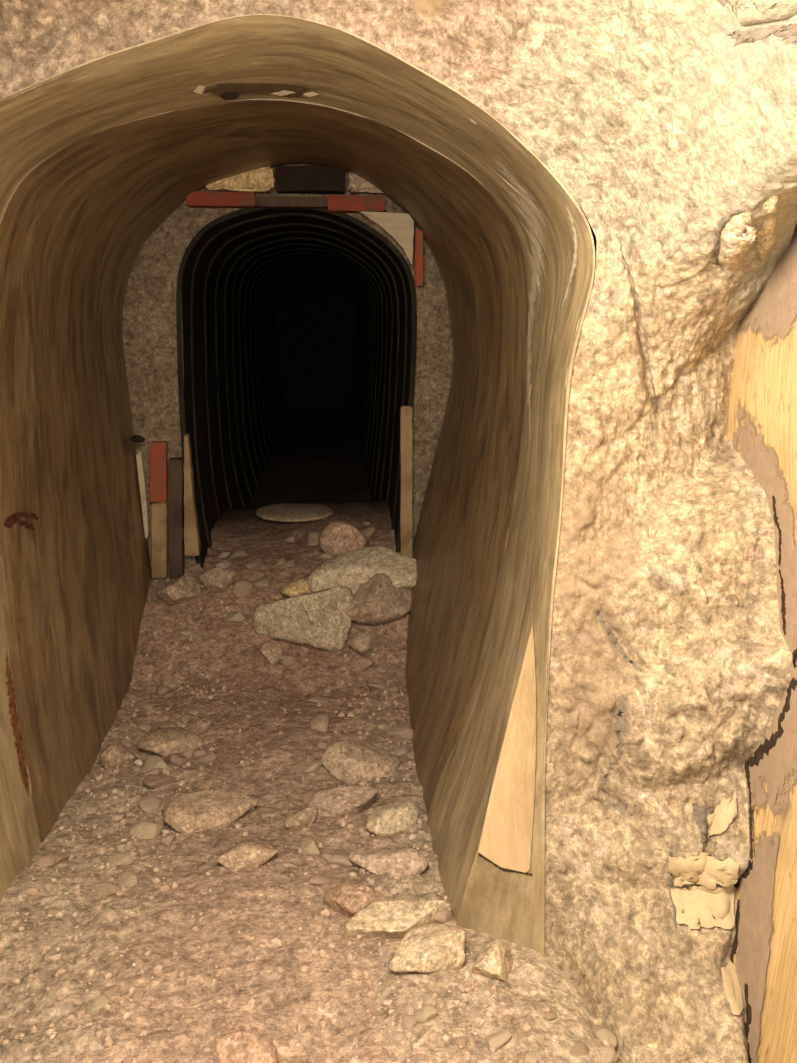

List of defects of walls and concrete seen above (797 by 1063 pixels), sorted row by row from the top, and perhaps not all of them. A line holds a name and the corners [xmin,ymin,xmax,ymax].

rust [4,511,39,530]
rust [6,653,29,792]